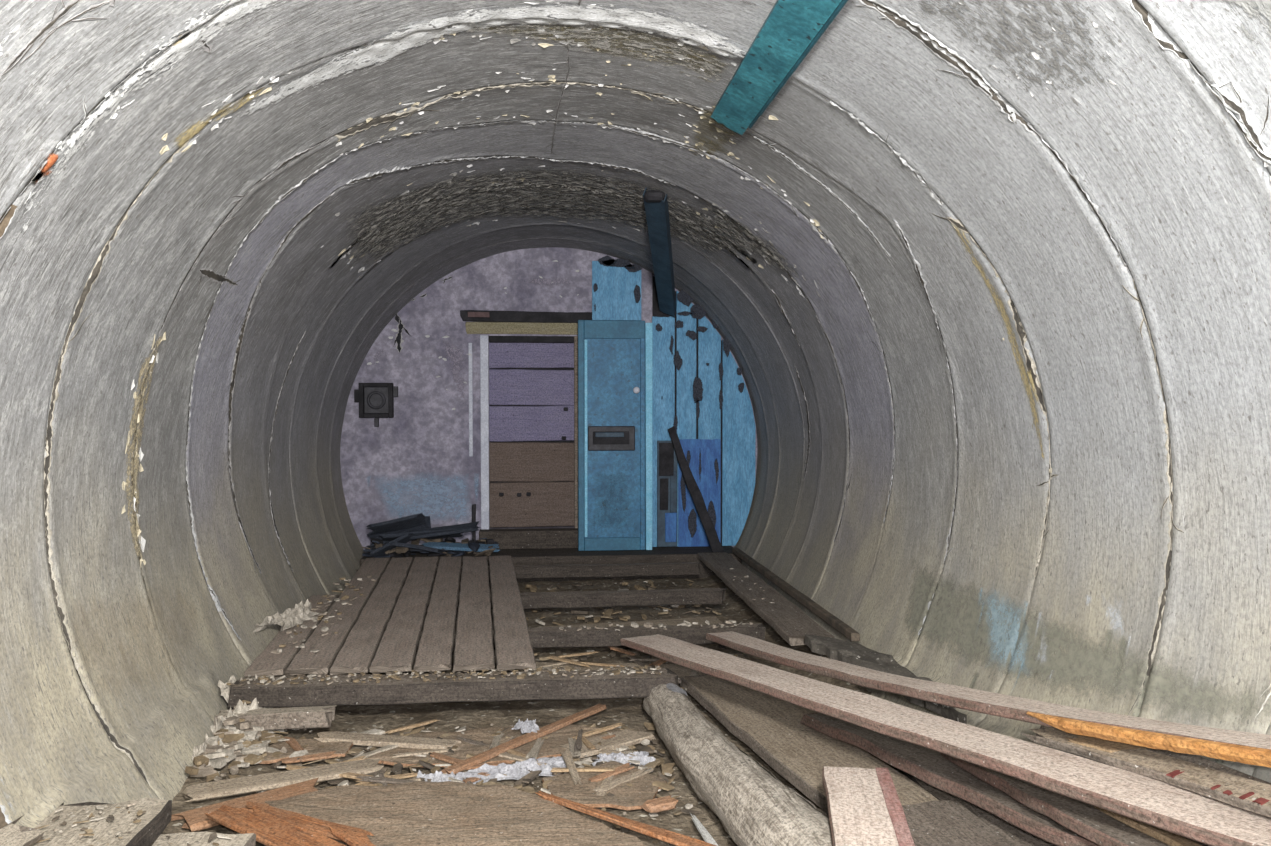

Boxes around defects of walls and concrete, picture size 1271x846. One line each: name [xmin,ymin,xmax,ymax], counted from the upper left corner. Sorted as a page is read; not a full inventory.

rust [36,154,59,182]
crack [0,0,235,239]
crack [44,115,214,786]
peeling [121,332,166,567]
peeling [14,0,286,240]
peeling [159,1,745,155]
crack [131,0,960,641]
peeling [321,163,821,303]
crack [830,0,1184,716]
crack [1129,0,1271,164]
water stain [908,571,1265,717]
crack [0,805,12,829]